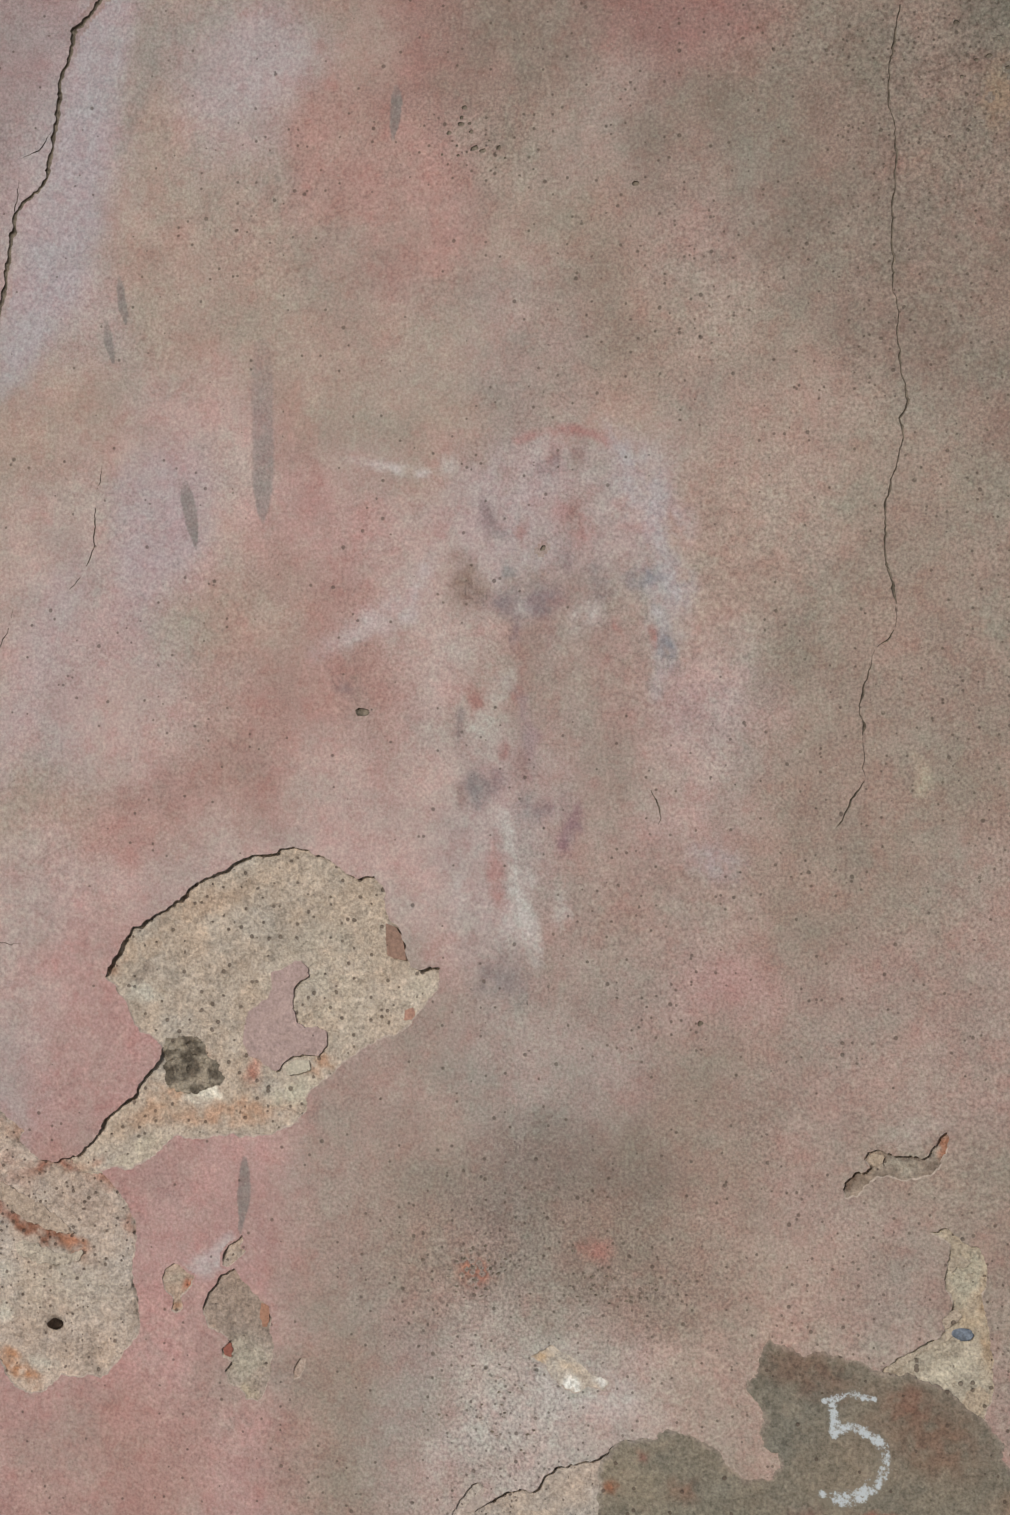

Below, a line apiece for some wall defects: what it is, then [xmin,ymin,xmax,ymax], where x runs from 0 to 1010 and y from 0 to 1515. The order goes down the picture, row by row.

crack [0,0,103,316]
crack [835,5,910,829]
flaking render [0,846,440,1402]
flaking render [843,1132,949,1200]
flaking render [530,1345,610,1394]
flaking render [882,1228,994,1420]
flaking render [452,1446,613,1515]